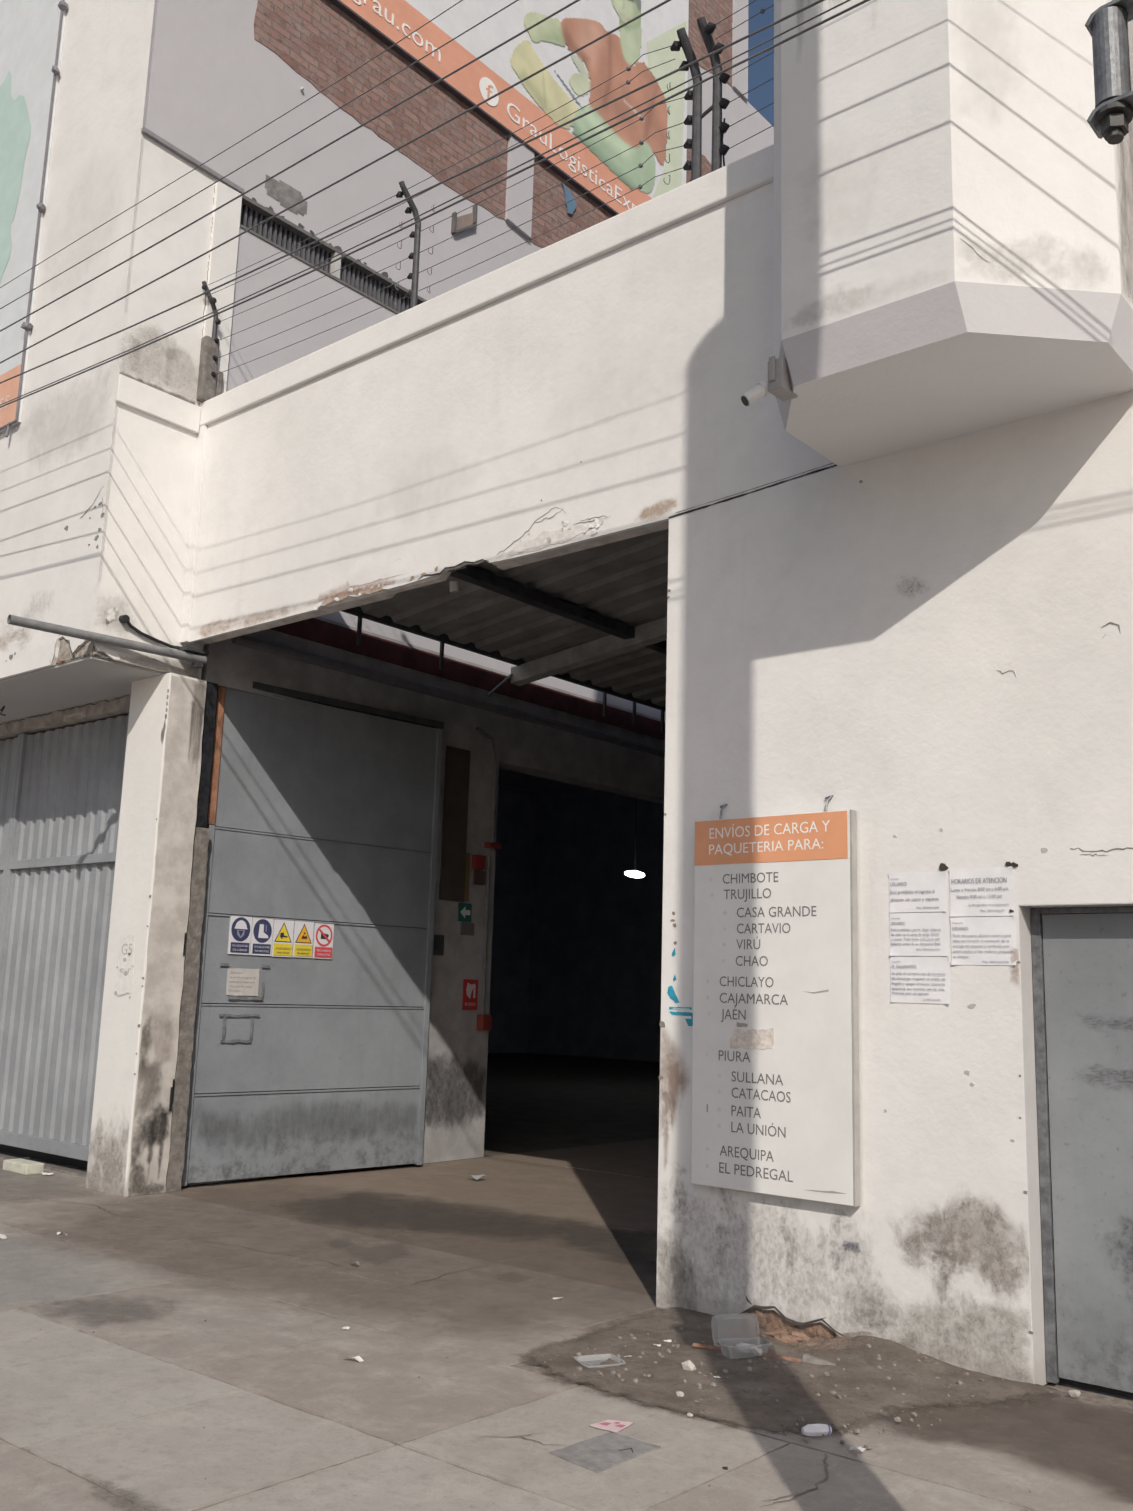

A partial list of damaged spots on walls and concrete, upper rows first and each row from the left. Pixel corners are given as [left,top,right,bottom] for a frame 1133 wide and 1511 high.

flaking render [254,0,508,219]
peeling [410,517,604,580]
leakage [662,1048,685,1105]
leakage [87,1027,166,1196]
mould [904,1201,1020,1291]
flaking render [723,1308,864,1365]
crack [759,1454,829,1507]